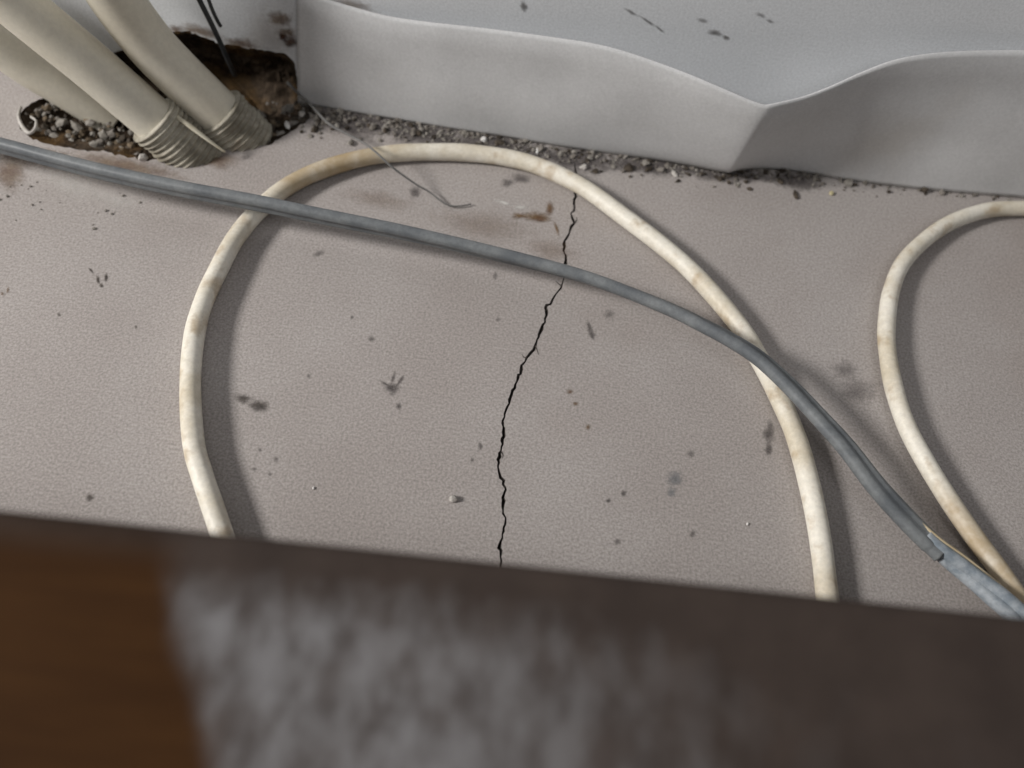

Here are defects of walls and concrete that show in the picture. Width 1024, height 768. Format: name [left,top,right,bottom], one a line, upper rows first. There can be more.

spalling [17,98,157,161]
spalling [114,50,168,99]
spalling [173,31,313,145]
crack [496,149,577,563]